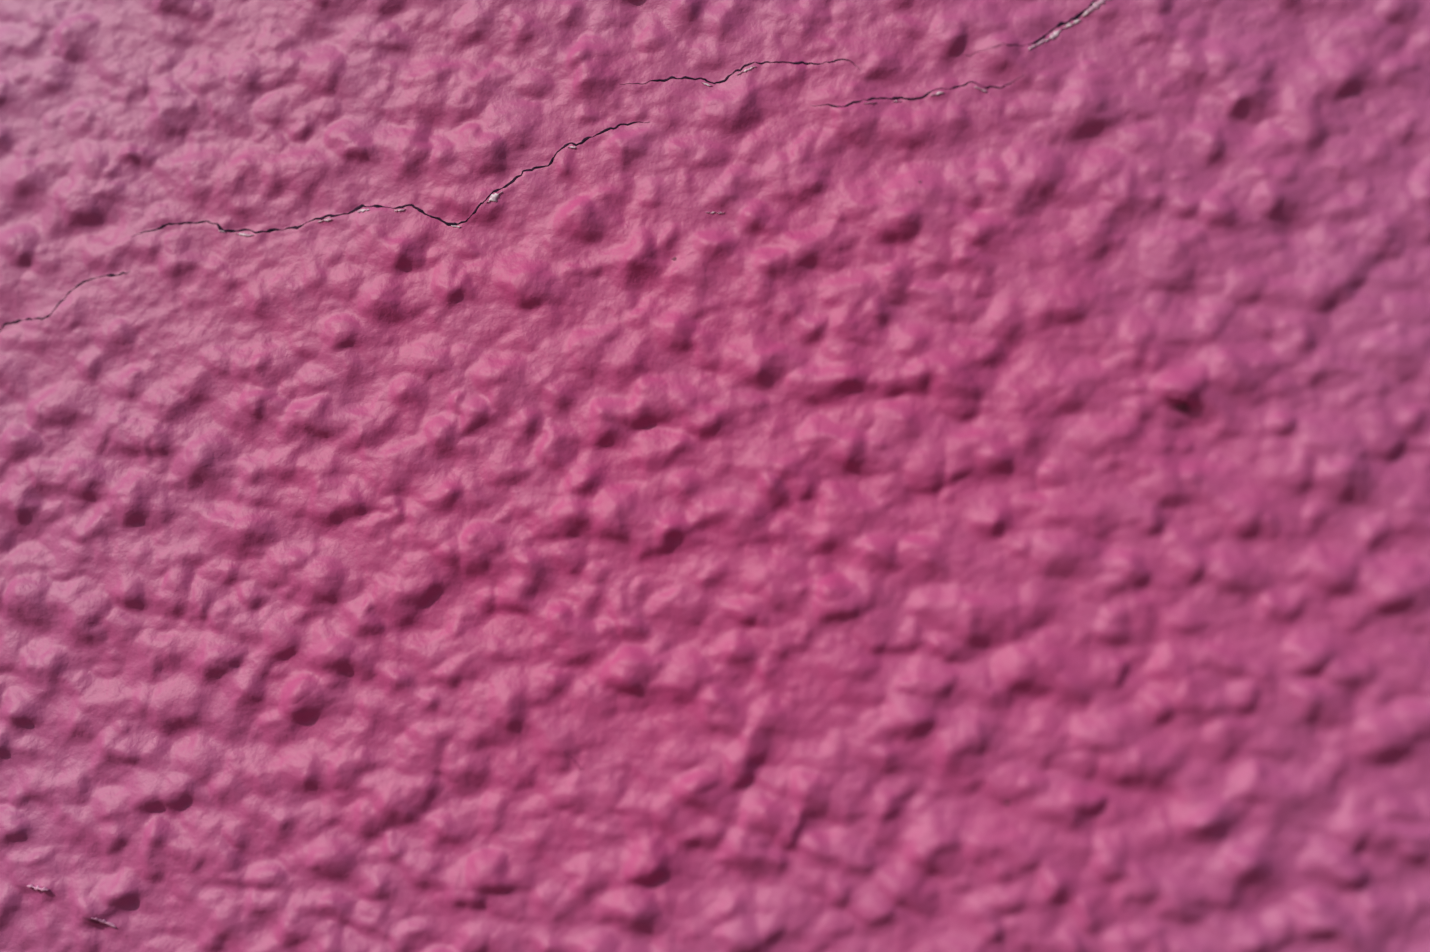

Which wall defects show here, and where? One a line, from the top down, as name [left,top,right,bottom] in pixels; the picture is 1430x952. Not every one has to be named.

crack [626,0,1105,107]
crack [132,122,648,237]
crack [0,272,129,331]